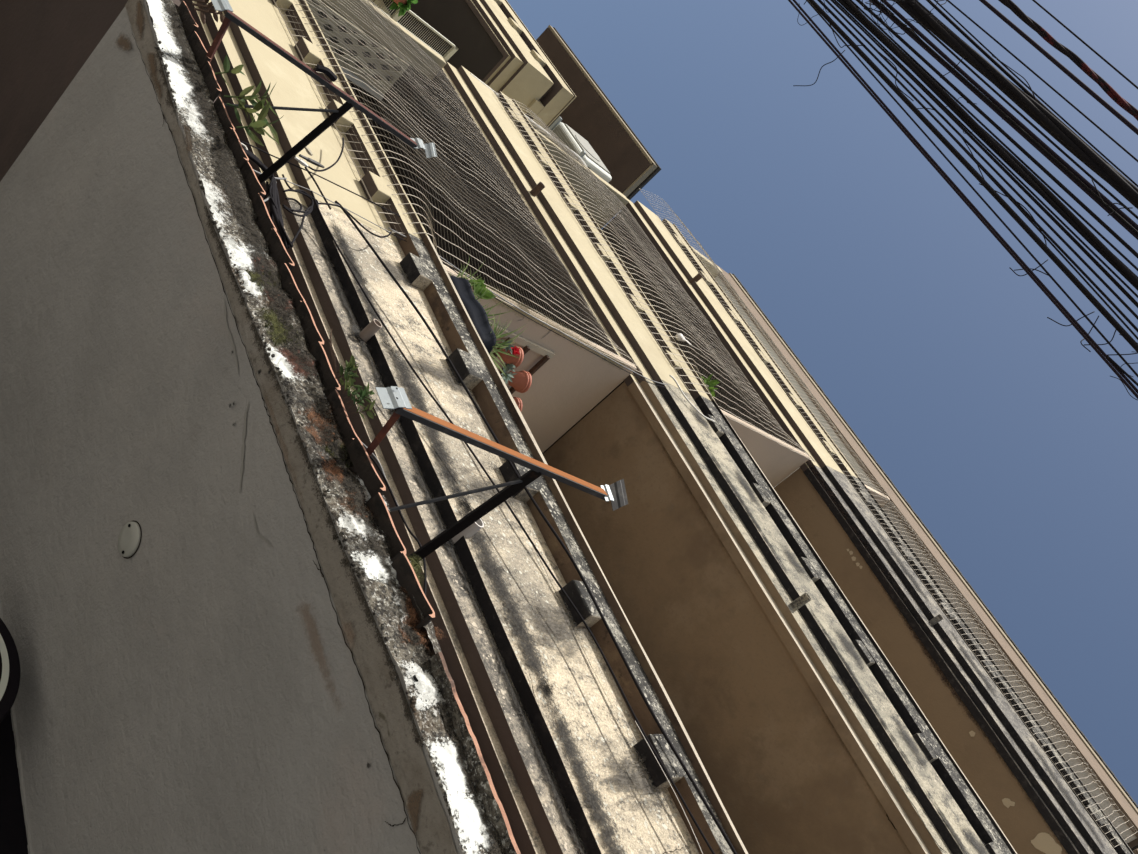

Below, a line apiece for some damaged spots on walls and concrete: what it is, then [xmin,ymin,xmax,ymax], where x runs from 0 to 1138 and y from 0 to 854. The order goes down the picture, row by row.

crack [129,20,421,854]
leakage [164,0,529,854]
leakage [389,409,588,854]
leakage [471,529,671,854]
mould [813,613,925,772]
leakage [928,792,988,854]
peeling [1031,832,1062,854]